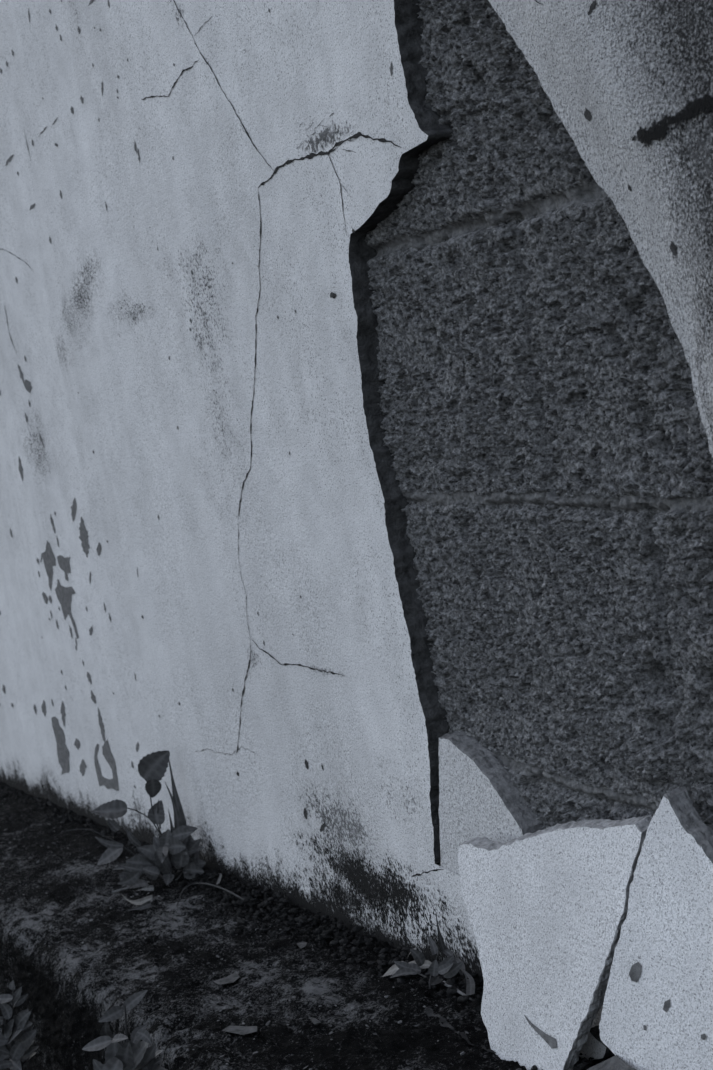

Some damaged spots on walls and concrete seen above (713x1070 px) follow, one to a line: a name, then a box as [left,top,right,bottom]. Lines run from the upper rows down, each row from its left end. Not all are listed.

crack [142,0,402,765]
spalling [349,0,713,863]